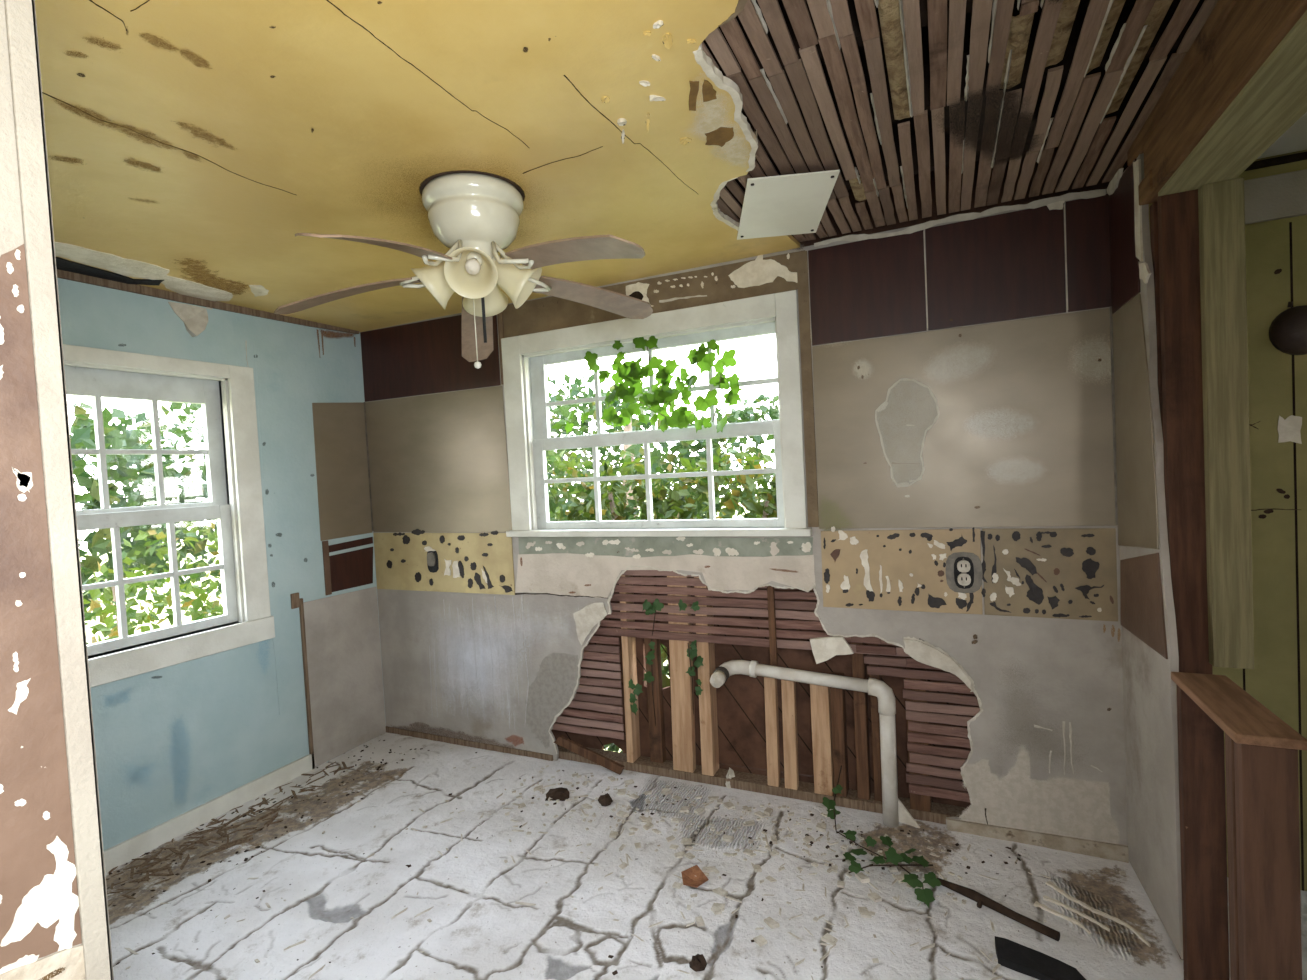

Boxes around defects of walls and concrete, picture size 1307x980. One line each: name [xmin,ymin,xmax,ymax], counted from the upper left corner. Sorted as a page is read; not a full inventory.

crack [89,0,150,32]
crack [42,92,296,195]
crack [326,0,698,194]
spalling [601,0,1219,314]
water stain [934,80,1052,165]
peeling [6,250,24,313]
flaking render [54,242,269,337]
flaking render [503,296,627,338]
peeling [12,467,33,501]
peeling [8,652,31,715]
spalling [515,526,1121,844]
peeling [0,836,79,974]